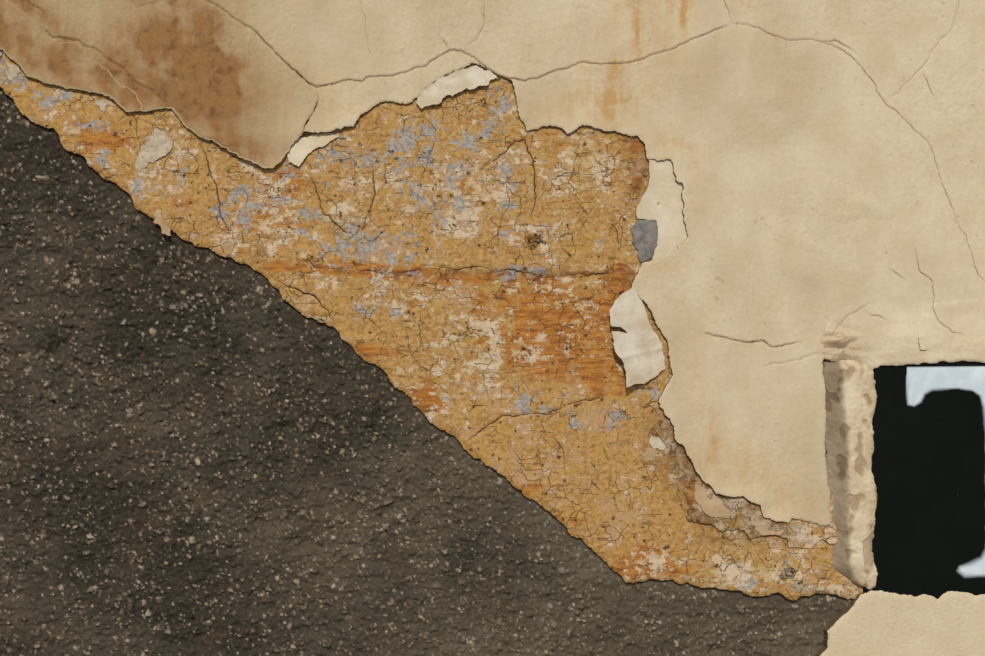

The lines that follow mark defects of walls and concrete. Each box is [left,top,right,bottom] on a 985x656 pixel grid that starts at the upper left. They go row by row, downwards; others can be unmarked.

crack [24,0,166,102]
crack [202,147,230,236]
crack [207,0,985,281]
crack [282,282,337,327]
peeling [0,49,863,601]
crack [706,333,802,366]